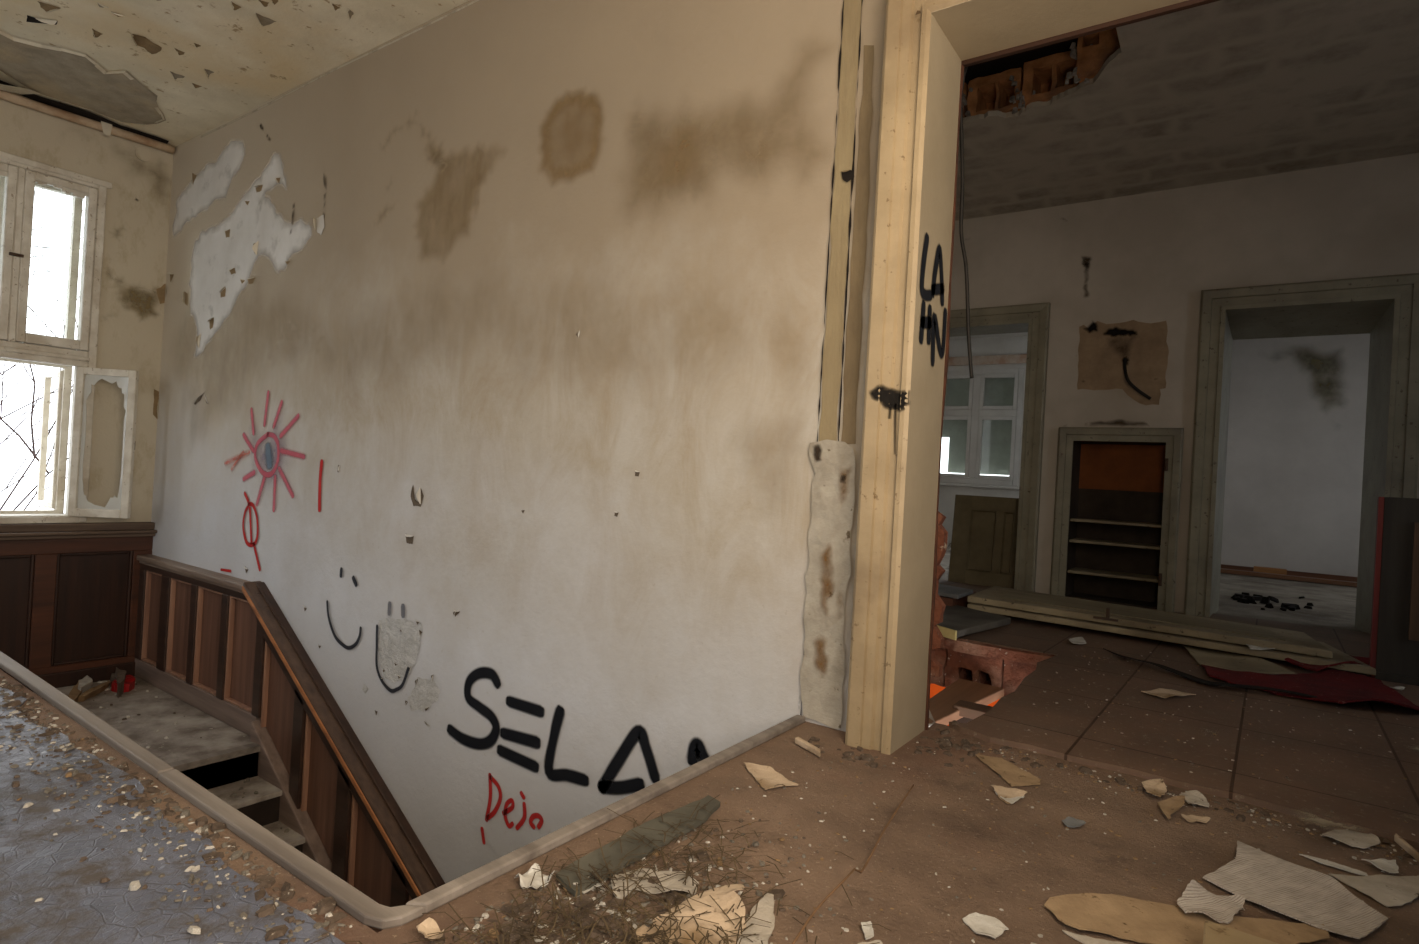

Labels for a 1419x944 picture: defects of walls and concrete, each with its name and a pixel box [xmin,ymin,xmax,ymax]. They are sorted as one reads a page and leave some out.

peeling [38,1,61,12]
peeling [231,0,278,26]
peeling [131,34,201,55]
flaking render [0,30,166,125]
peeling [170,69,214,88]
damp [543,95,600,177]
peeling [157,142,324,354]
damp [1297,351,1338,402]
flaking render [800,440,855,729]